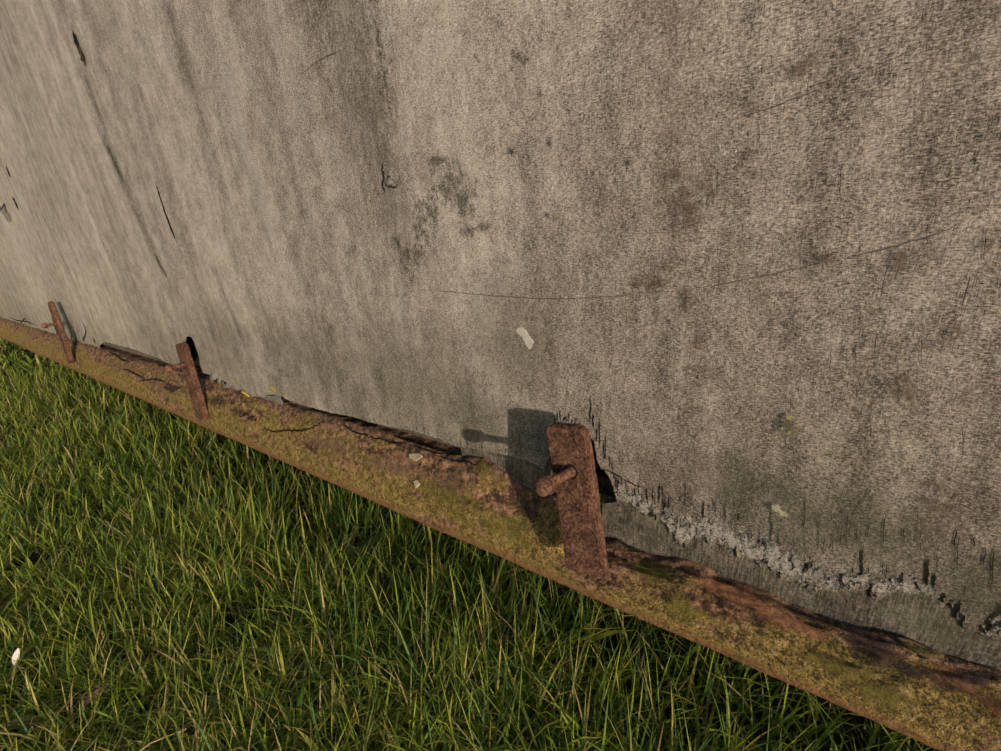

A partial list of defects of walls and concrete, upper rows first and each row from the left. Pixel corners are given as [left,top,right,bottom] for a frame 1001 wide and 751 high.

rust [491,485,539,522]
water stain [616,487,919,598]
crack [554,396,1001,633]
peeling [617,491,939,596]
rust [679,571,1001,719]
peeling [892,635,945,658]